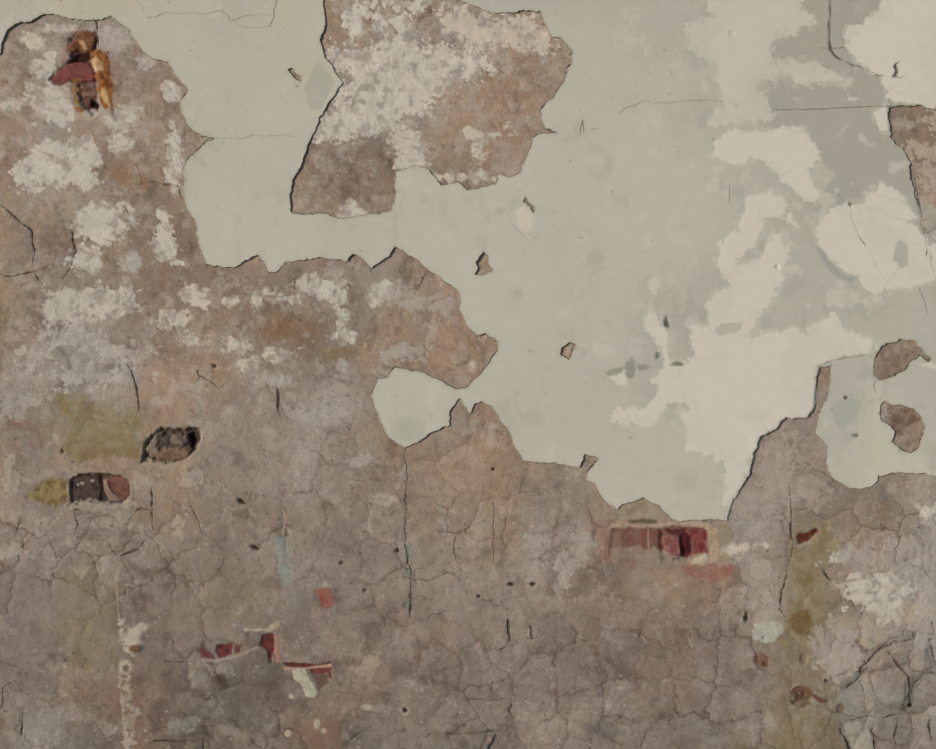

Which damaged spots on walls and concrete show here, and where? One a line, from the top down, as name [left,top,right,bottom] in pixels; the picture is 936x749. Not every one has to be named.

peeling [289,0,573,219]
peeling [680,0,936,208]
crack [827,0,914,78]
peeling [809,149,936,305]
spalling [147,426,202,464]
peeling [252,368,300,393]
water stain [253,310,379,366]
peeling [599,185,936,557]
crack [401,451,494,618]
crack [779,484,793,628]
crack [499,619,534,651]
crack [840,618,936,749]